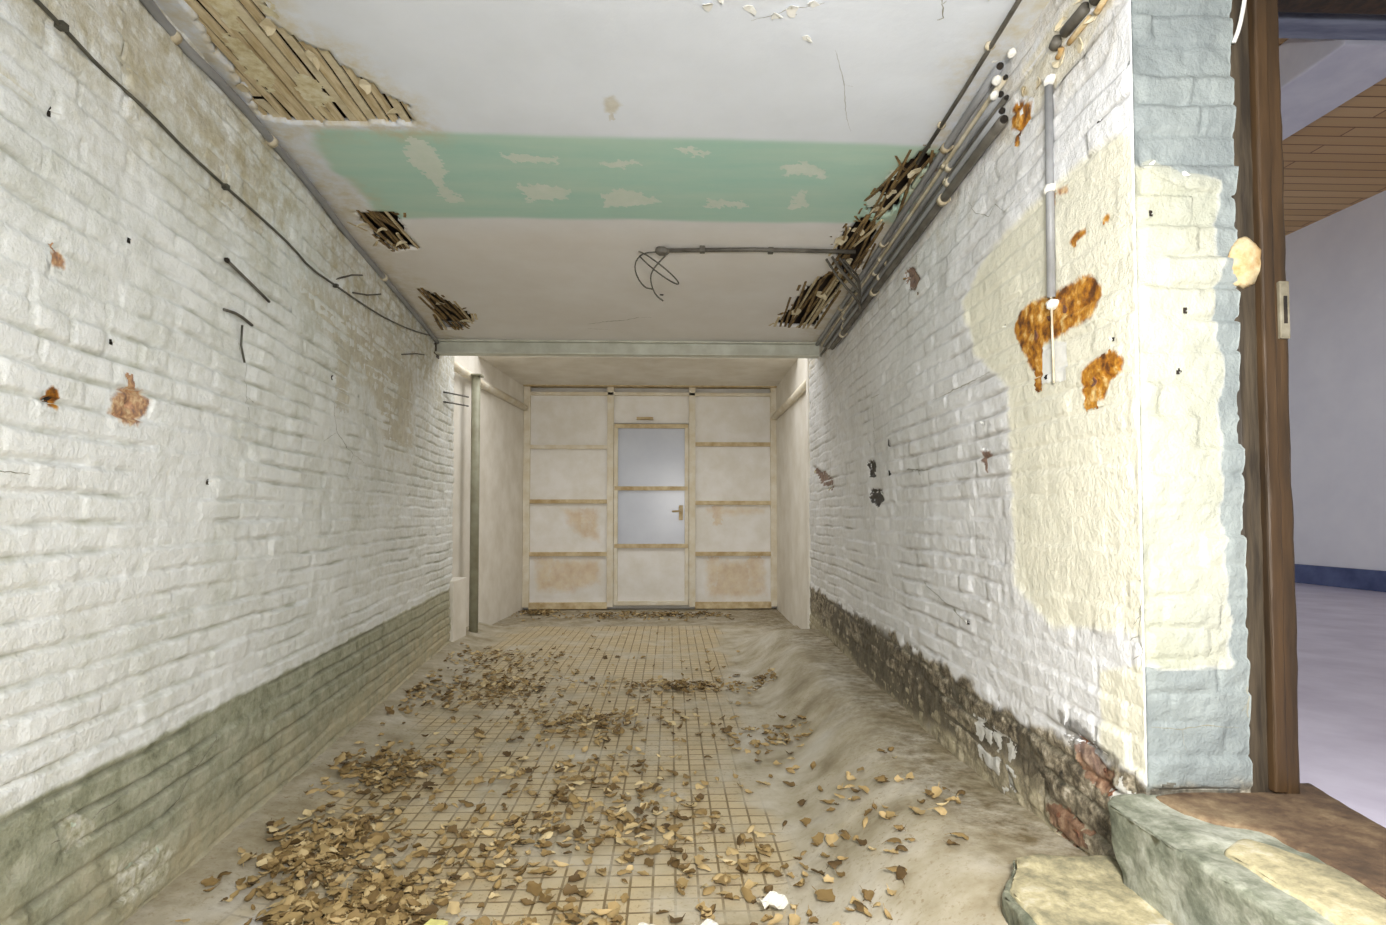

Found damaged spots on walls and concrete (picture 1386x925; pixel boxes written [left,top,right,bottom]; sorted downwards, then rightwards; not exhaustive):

flaking render [184,0,414,123]
rust [1009,95,1035,147]
flaking render [347,210,420,252]
flaking render [768,145,940,329]
flaking render [417,288,478,330]
rust [1012,268,1107,393]
rust [1078,345,1127,412]
damp [826,590,1049,798]
spalling [1074,736,1117,796]
damp [1051,698,1245,799]